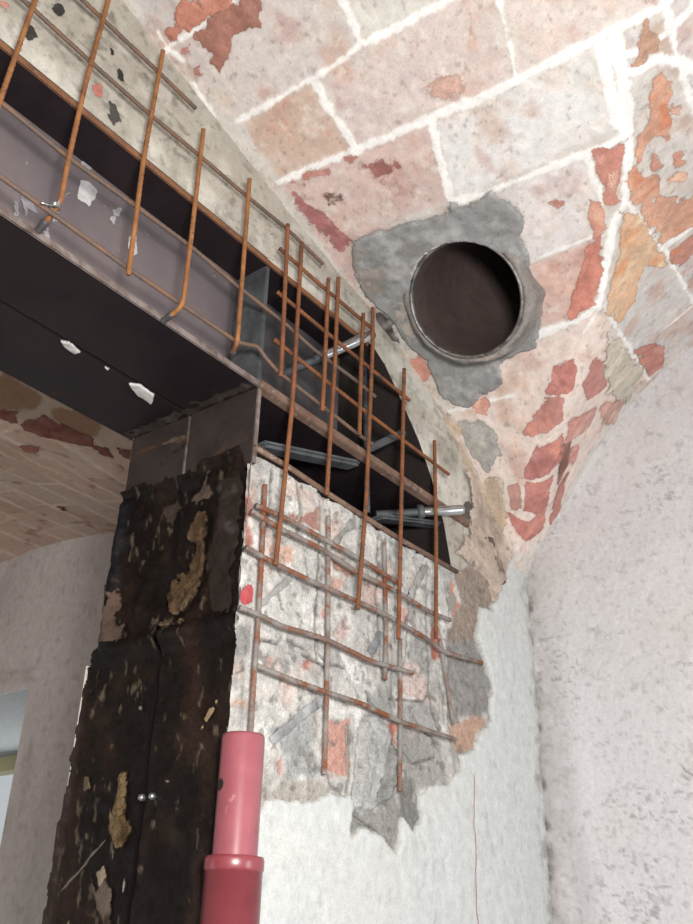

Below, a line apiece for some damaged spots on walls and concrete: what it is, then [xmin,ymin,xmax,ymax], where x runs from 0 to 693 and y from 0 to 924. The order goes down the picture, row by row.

peeling [567,72,693,323]
flaking render [0,0,492,850]
flaking render [507,357,625,541]
peeling [634,343,665,377]